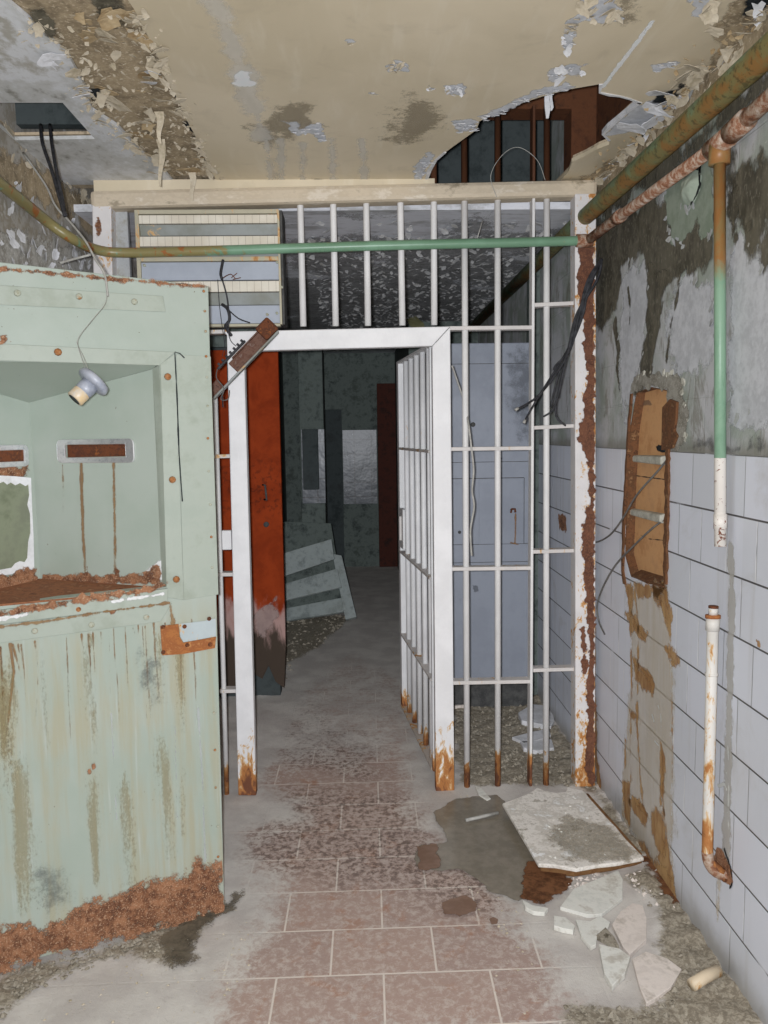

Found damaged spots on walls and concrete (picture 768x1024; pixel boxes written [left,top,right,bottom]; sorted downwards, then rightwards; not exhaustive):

peeling [14,0,225,201]
peeling [426,84,467,97]
peeling [662,161,714,249]
peeling [617,257,714,451]
peeling [726,232,768,432]
rust [0,463,175,662]
rust [576,246,601,788]
rust [621,393,680,904]
rust [0,856,225,975]
rust [520,861,573,904]